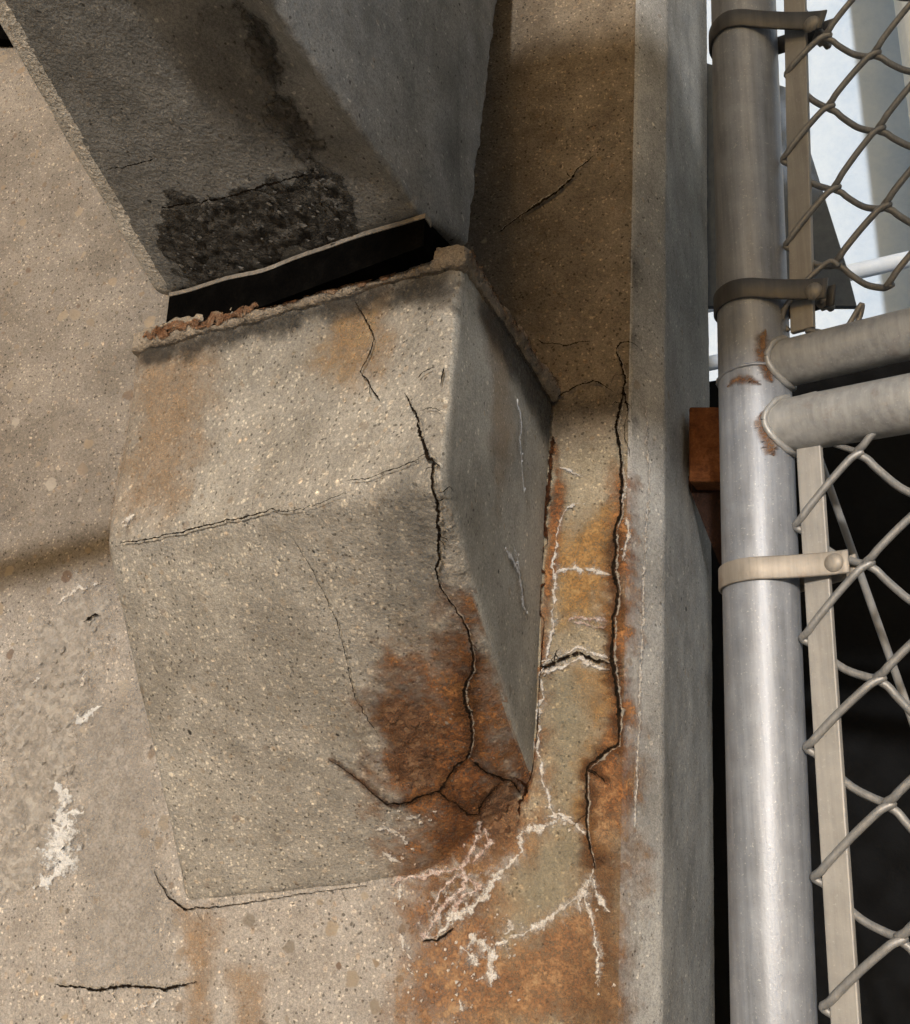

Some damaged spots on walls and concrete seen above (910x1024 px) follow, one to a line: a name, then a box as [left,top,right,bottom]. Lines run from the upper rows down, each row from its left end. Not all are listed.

spalling [155,3,360,290]
spalling [142,272,396,340]
crack [355,302,378,398]
crack [498,155,594,232]
leakage [27,686,167,976]
crack [54,981,196,1000]
crack [154,871,369,920]
crack [120,341,638,869]
leakage [367,503,611,1023]
rust [377,447,637,1024]